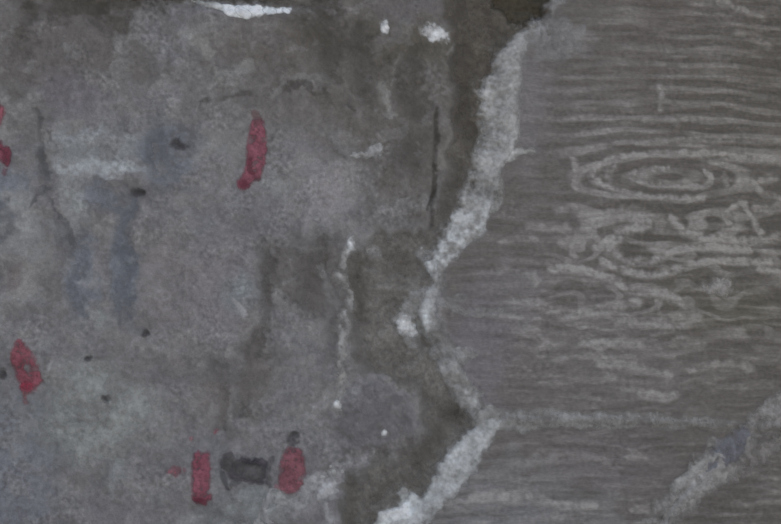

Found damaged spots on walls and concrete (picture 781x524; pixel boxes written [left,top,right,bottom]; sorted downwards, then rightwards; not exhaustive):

crack [646,393,781,524]